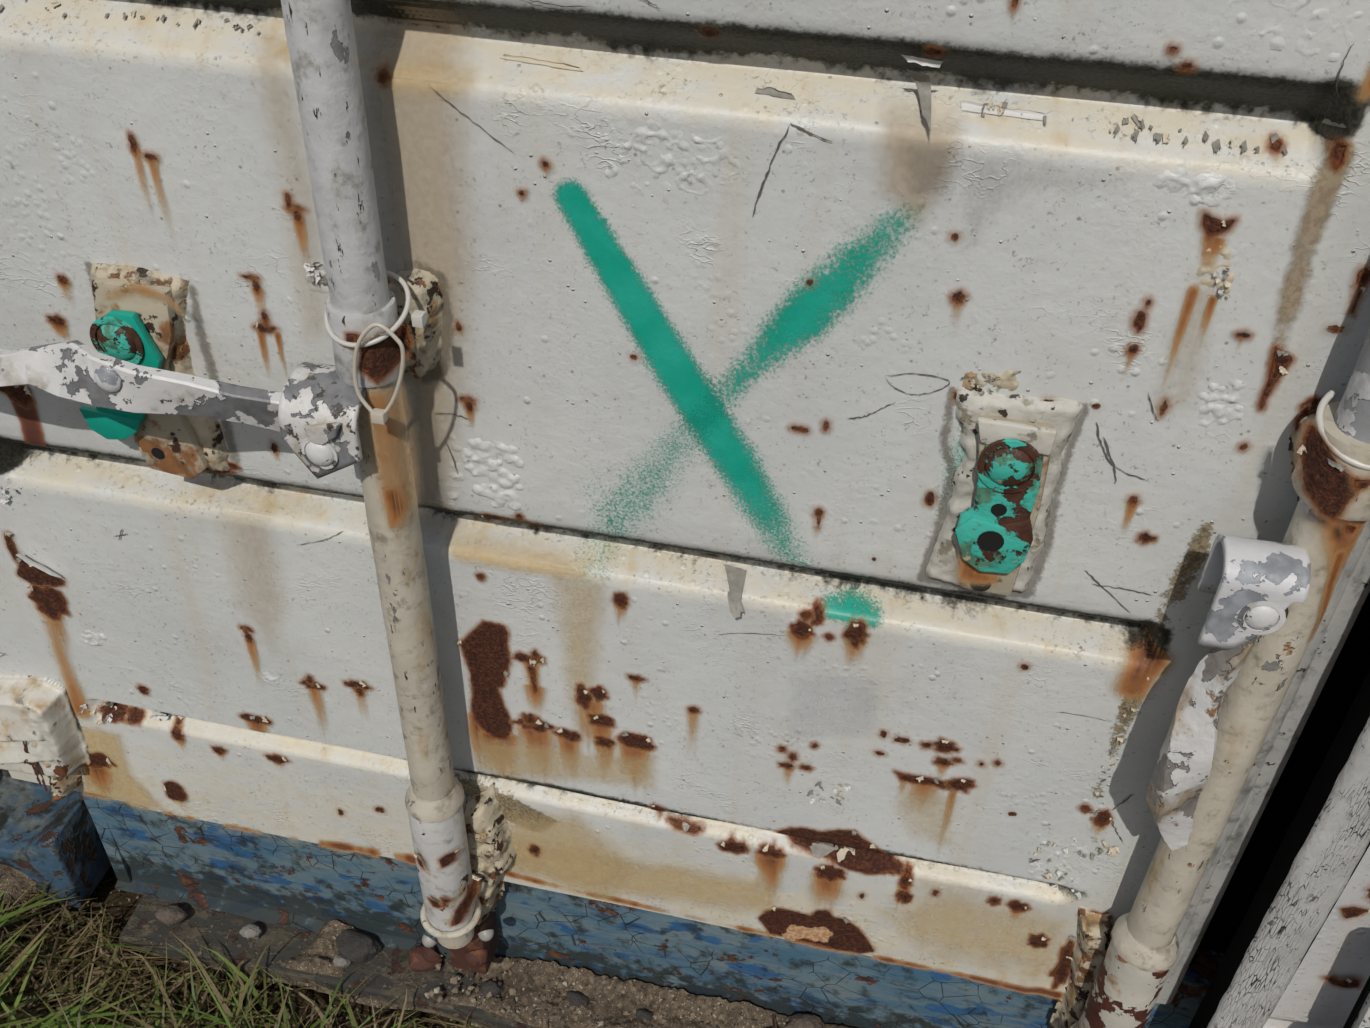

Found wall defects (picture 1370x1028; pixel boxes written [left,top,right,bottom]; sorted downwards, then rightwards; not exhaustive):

corrosion [127,131,163,198]
corrosion [1200,211,1238,262]
corrosion [240,273,284,363]
corrosion [1171,286,1218,361]
corrosion [1257,345,1295,411]
corrosion [1294,395,1370,641]
corrosion [4,531,149,725]
corrosion [787,599,870,658]
corrosion [454,620,656,783]
corrosion [651,804,705,836]
corrosion [875,731,1001,831]
corrosion [716,827,1076,999]